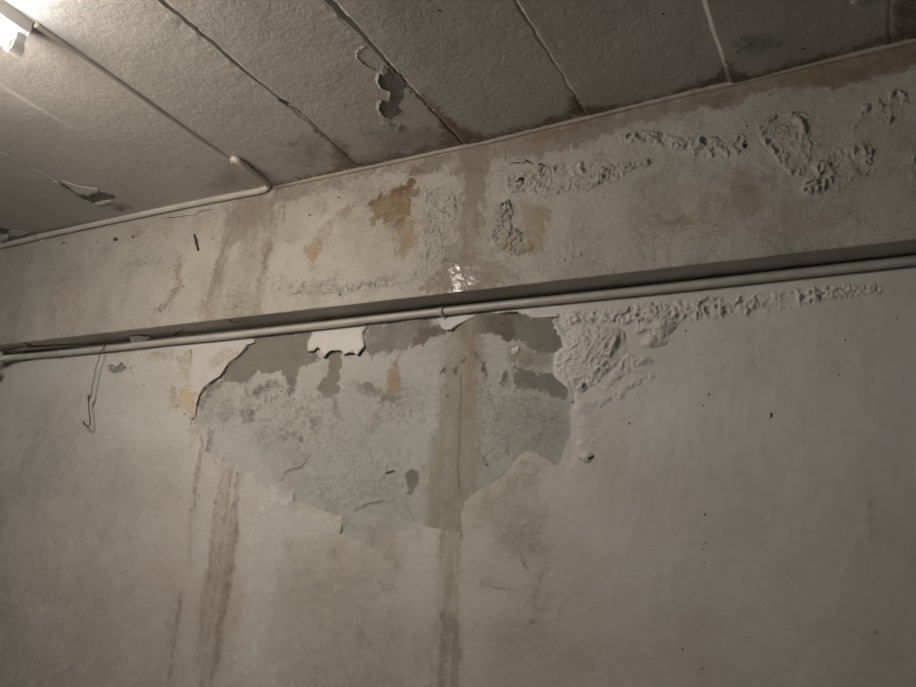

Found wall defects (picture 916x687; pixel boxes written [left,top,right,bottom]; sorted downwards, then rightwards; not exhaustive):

peeling [53,181,116,206]
peeling [355,46,412,131]
water stain [202,0,916,320]
peeling [189,310,574,540]
water stain [427,313,481,687]